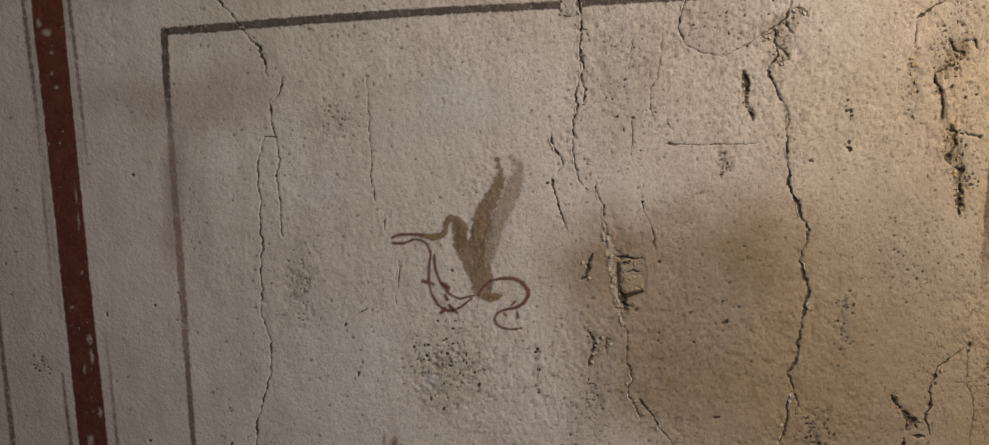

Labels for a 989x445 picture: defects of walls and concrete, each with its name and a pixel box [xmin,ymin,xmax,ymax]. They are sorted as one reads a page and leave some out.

crack [218,0,285,444]
crack [546,0,607,234]
crack [630,0,811,445]
crack [909,0,946,118]
crack [604,308,673,445]
crack [924,342,975,445]